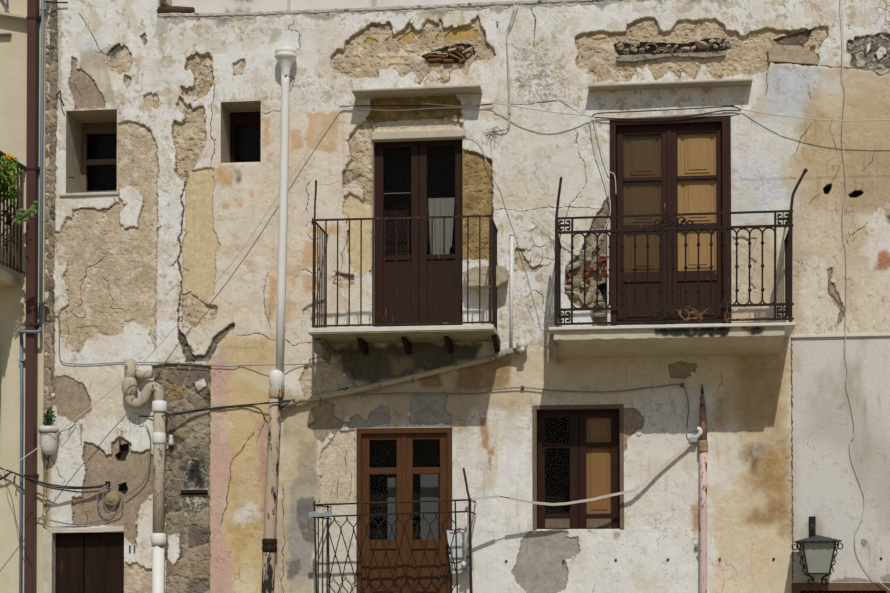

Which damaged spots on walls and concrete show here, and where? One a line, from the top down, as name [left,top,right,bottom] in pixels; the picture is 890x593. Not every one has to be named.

spalling [332,18,495,84]
spalling [576,19,827,84]
peeling [44,0,161,426]
crack [169,170,193,356]
flaking render [331,96,465,288]
flaking render [462,150,493,262]
peeling [73,437,153,544]
flaking render [153,365,211,593]
crack [220,413,265,525]
peeling [300,363,390,513]
peeling [124,559,152,593]
peeling [513,531,579,593]